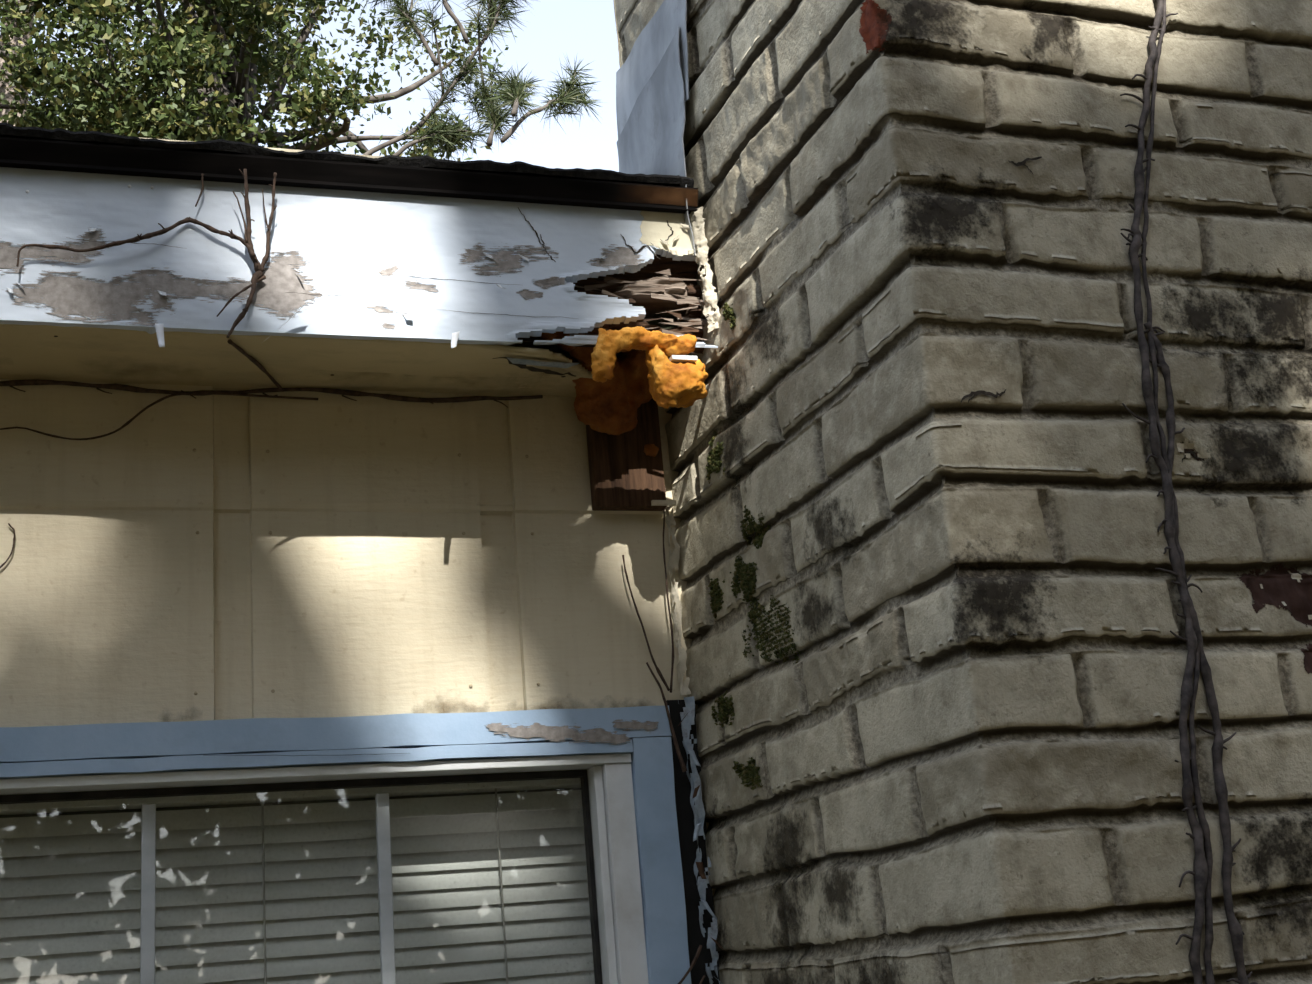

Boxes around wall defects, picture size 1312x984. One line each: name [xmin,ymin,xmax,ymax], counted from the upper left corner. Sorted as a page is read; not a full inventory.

peeling [0,228,323,347]
peeling [459,243,565,300]
peeling [1237,562,1312,627]
peeling [1301,643,1312,674]
peeling [484,719,659,745]